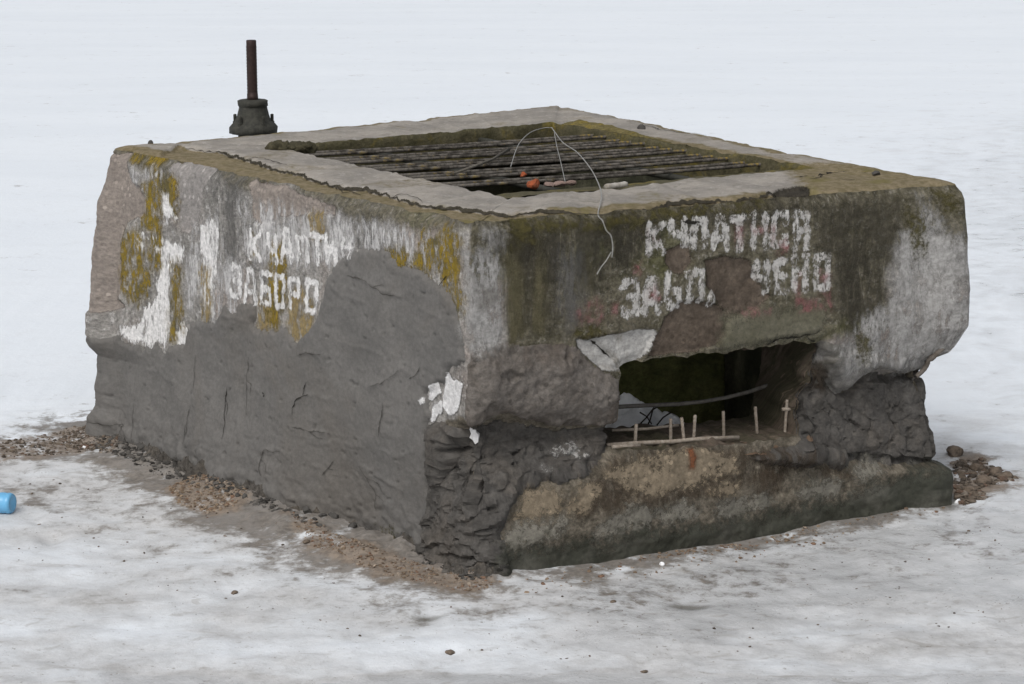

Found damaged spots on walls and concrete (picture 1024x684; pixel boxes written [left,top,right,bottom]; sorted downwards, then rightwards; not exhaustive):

spalling [88,153,431,350]
water stain [462,230,589,356]
water stain [839,205,970,377]
crack [222,366,264,436]
crack [292,385,324,439]
peeling [418,372,463,422]
peeling [469,428,480,444]
rust [576,447,850,519]